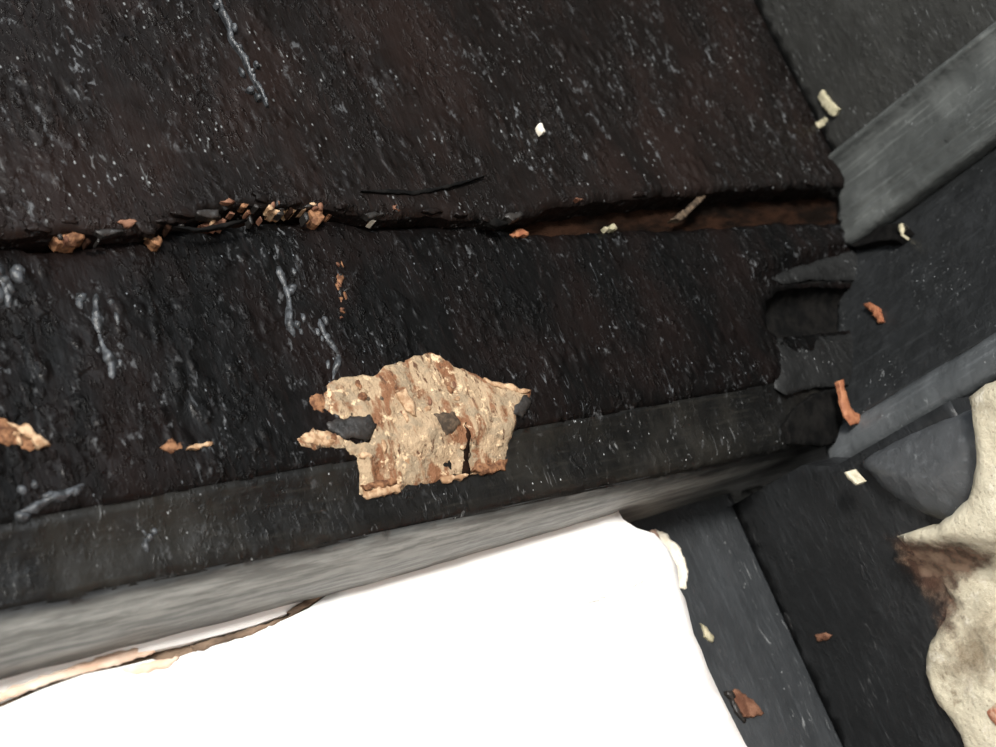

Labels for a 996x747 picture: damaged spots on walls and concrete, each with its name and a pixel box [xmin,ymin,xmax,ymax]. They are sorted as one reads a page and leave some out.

crack [24,175,840,254]
peeling [0,418,51,452]
peeling [297,353,532,500]